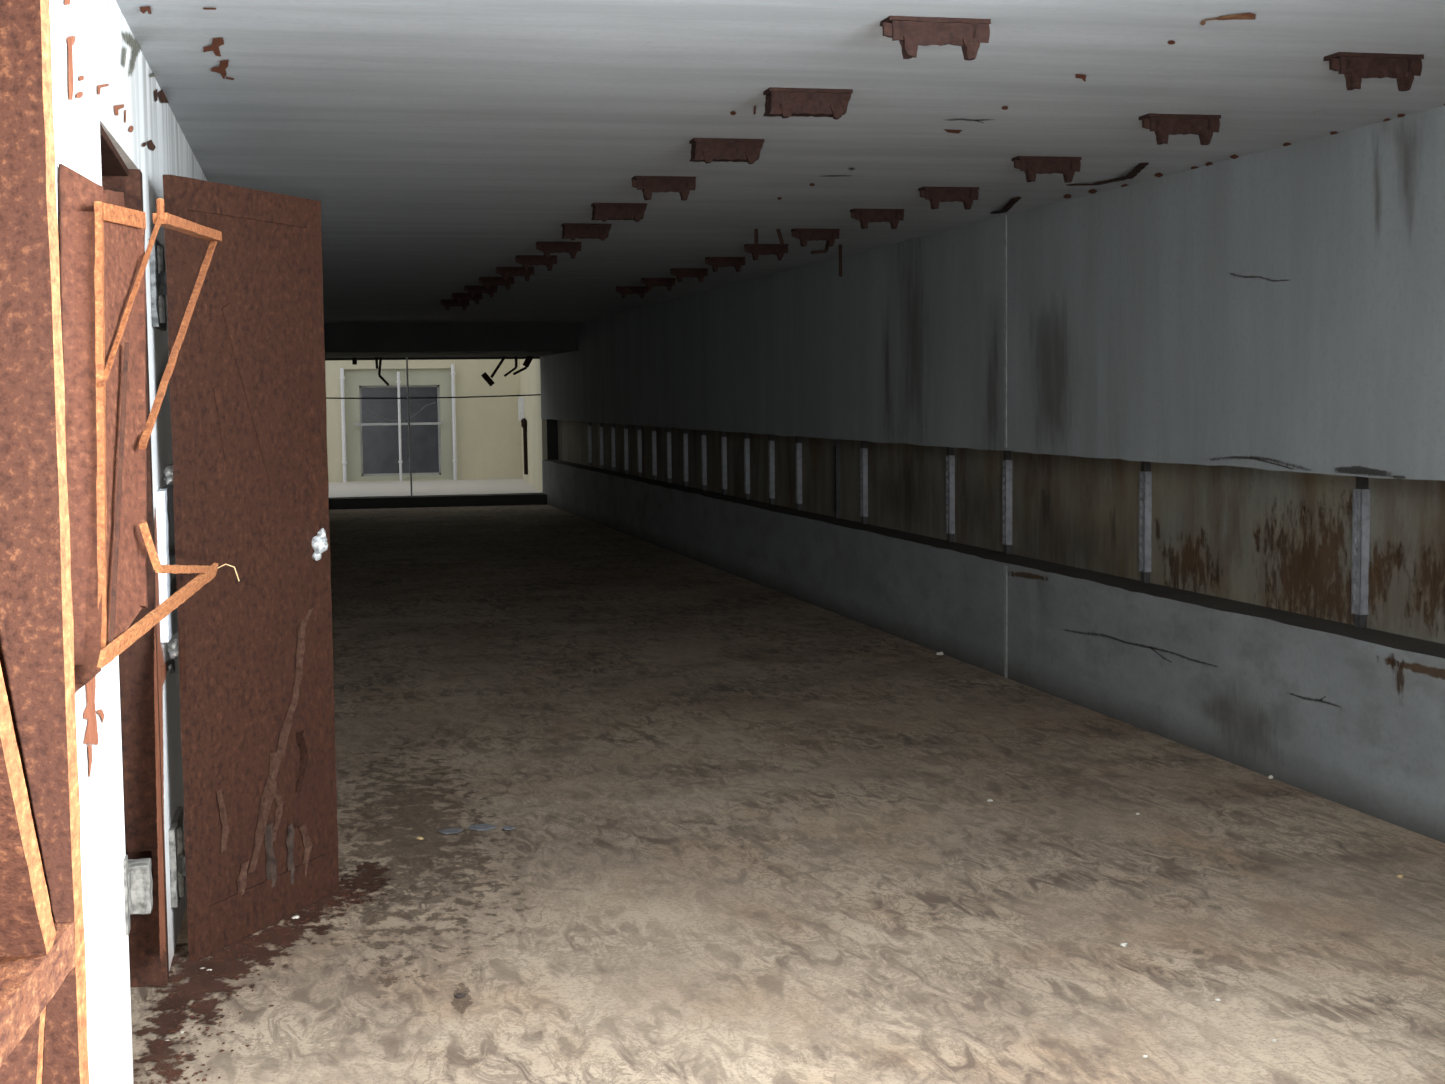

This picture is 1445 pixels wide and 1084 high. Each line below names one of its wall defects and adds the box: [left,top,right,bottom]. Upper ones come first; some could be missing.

rust [66,35,109,101]
rust [203,38,234,80]
rust [1156,519,1220,593]
rust [1254,493,1445,637]
rust [75,676,105,777]
crack [1064,629,1215,667]
crack [1290,693,1336,706]
rust [1385,654,1445,695]
rust [133,572,404,1084]